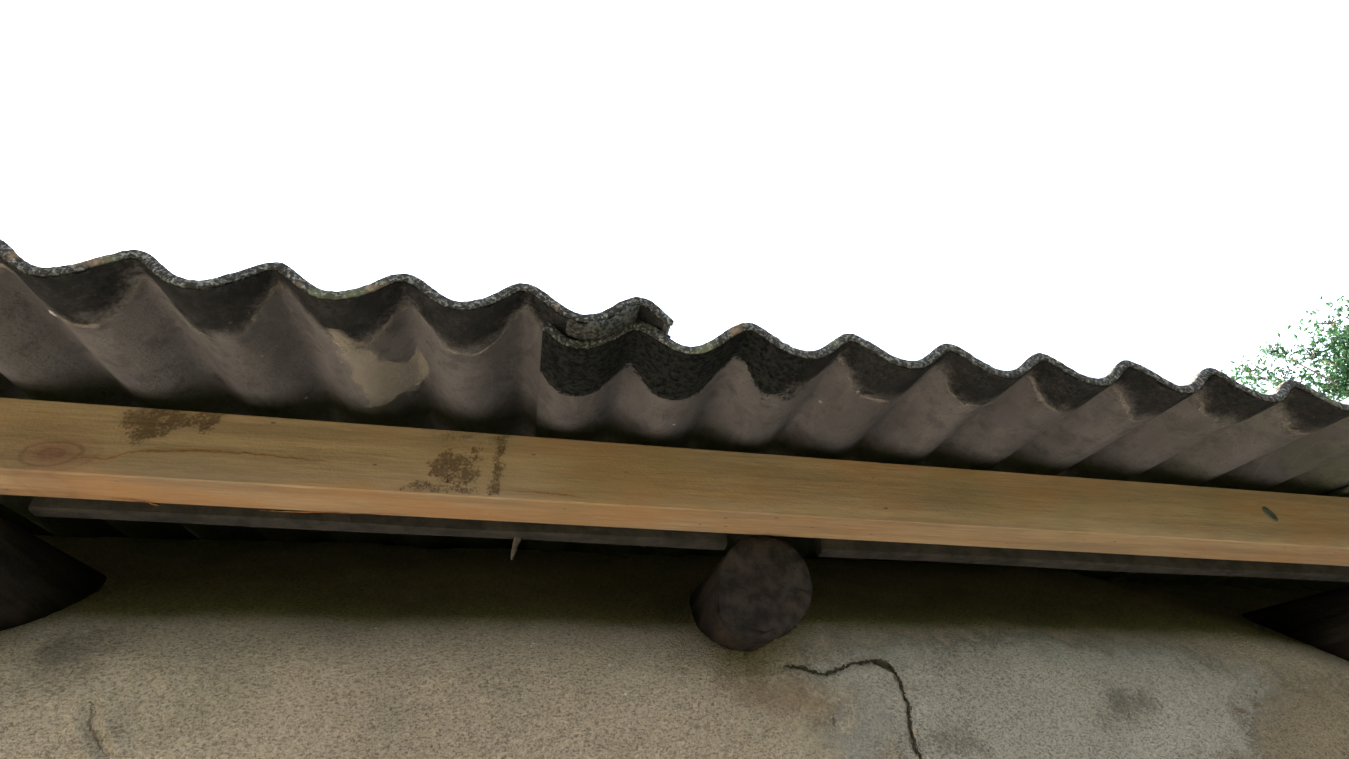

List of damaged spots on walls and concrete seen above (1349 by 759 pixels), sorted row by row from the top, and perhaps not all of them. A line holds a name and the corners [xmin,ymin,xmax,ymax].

crack [784,658,922,759]